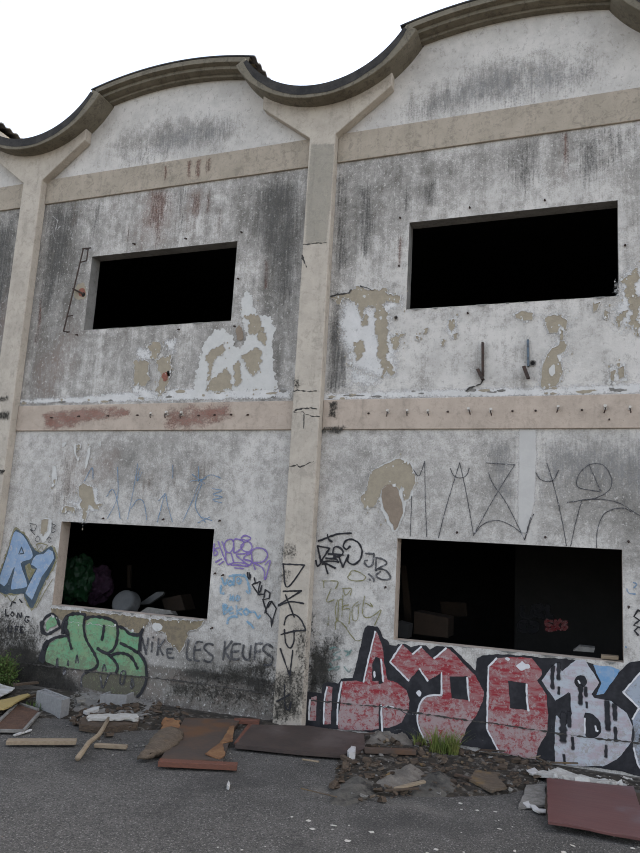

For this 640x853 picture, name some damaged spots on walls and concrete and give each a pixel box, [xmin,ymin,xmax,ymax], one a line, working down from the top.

peeling [20,291,292,404]
peeling [324,285,640,400]
peeling [592,261,640,340]
rust [43,408,130,430]
rust [167,406,229,428]
peeling [357,453,418,532]
water stain [0,606,78,691]
water stain [168,614,340,722]